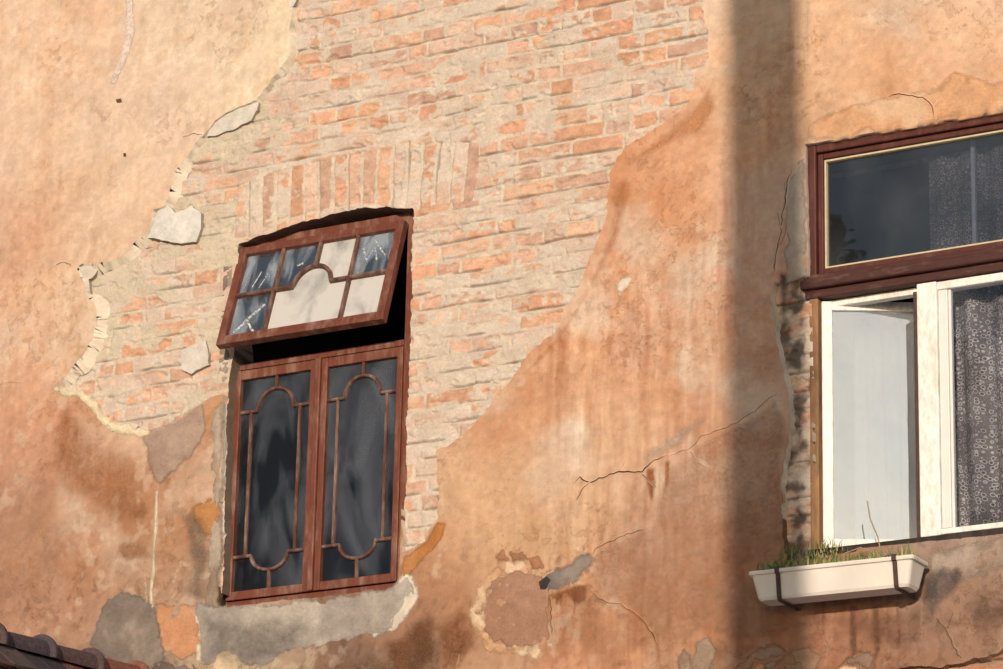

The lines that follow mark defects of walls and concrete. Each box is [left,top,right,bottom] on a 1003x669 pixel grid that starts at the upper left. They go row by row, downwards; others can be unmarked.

crack [887,91,938,120]
crack [771,167,795,278]
spalling [54,0,709,660]
spalling [775,160,814,565]
crack [571,390,779,501]
crack [590,527,645,557]
crack [590,590,659,649]
damp [926,569,959,612]
peeling [837,652,876,669]
spalling [948,654,1003,669]